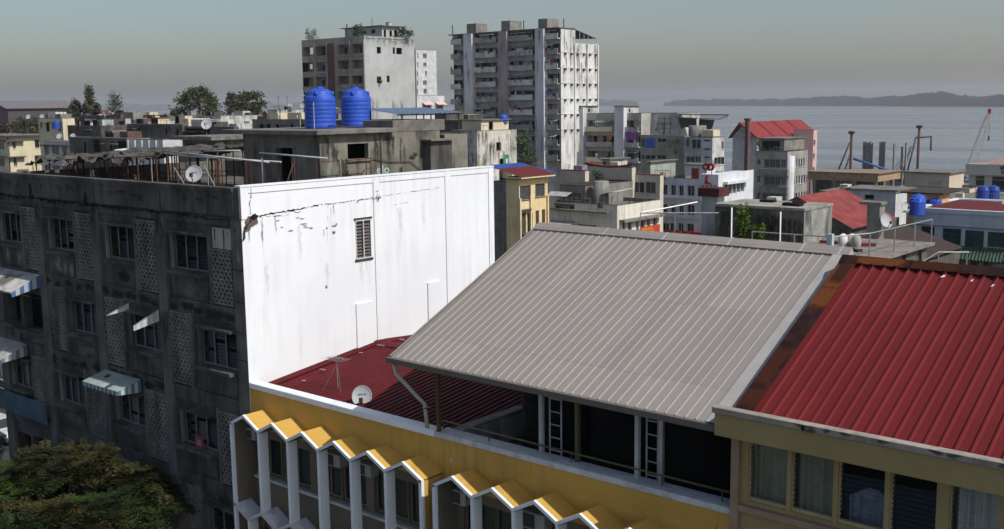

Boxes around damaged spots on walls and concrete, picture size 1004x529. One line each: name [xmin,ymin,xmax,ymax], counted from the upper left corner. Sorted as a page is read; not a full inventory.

crack [0,187,439,222]
rust [737,347,792,407]